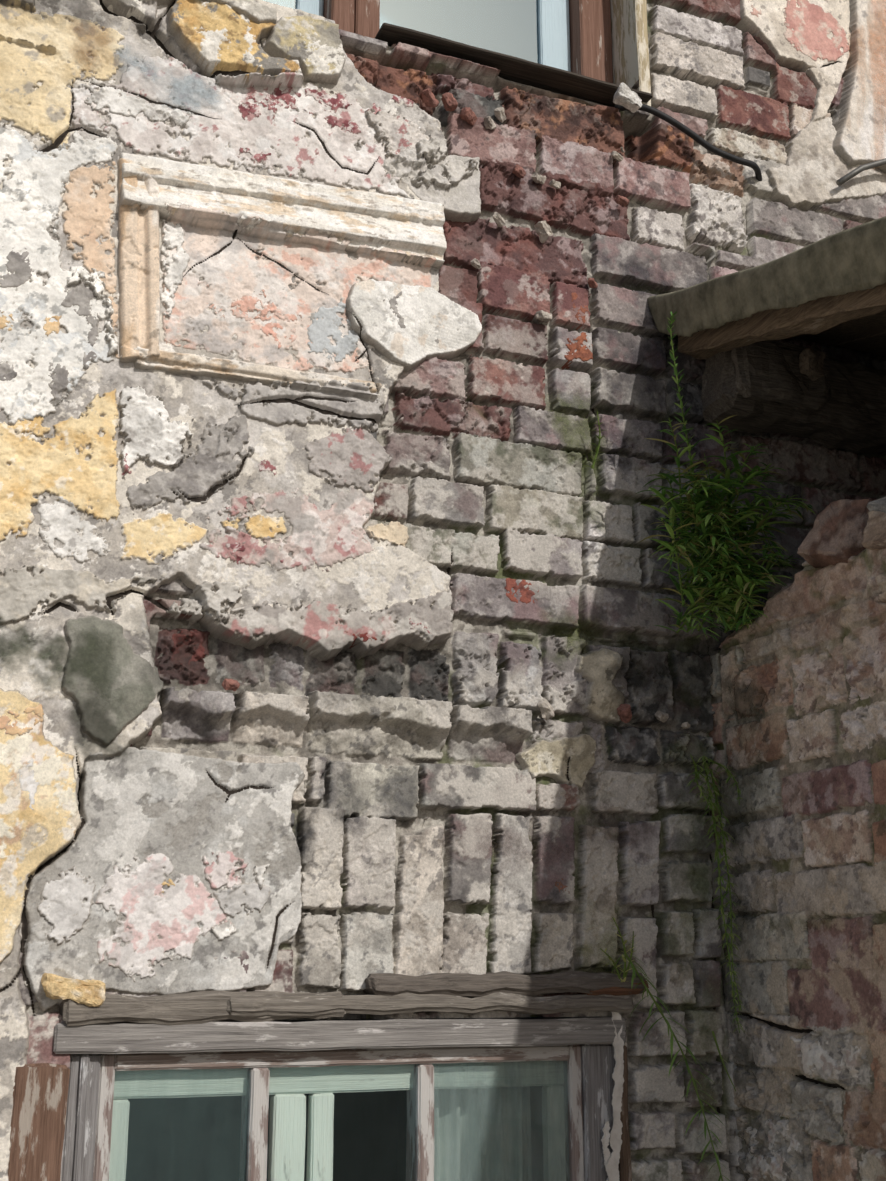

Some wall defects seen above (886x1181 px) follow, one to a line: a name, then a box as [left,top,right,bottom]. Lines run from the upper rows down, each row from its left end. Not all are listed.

crack [99,0,176,59]
crack [209,70,249,78]
peeling [783,0,850,62]
crack [293,121,380,175]
peeling [0,47,752,425]
crack [183,229,389,428]
peeling [0,202,437,625]
spalling [130,578,719,771]
crack [206,770,274,802]
crack [0,748,85,1013]
peeling [37,850,271,982]